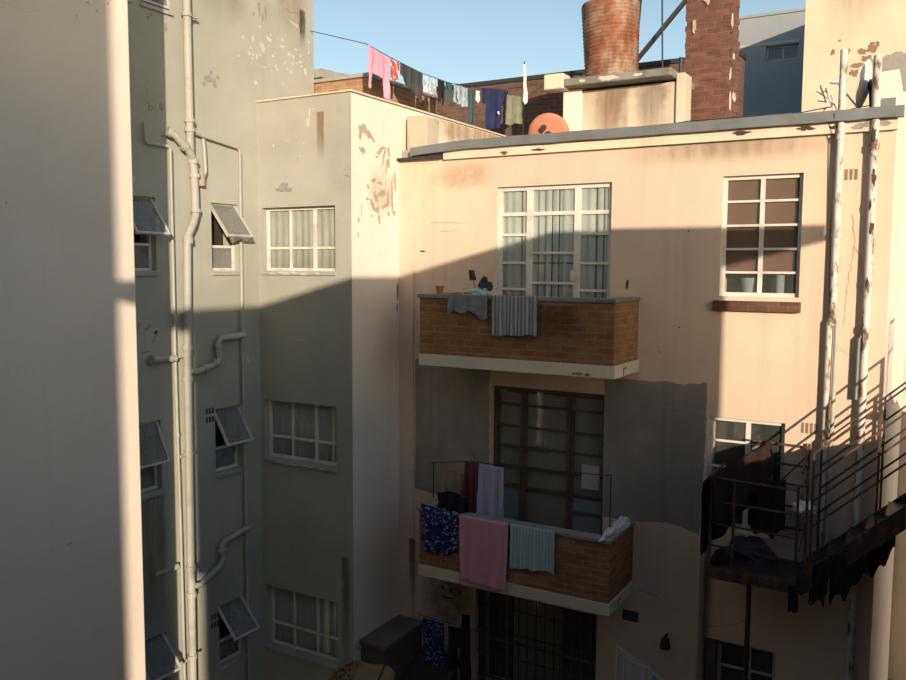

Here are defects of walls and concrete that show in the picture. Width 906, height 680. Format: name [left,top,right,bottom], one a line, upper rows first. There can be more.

crack [129,52,163,116]
peeling [238,1,310,85]
spalling [831,40,880,77]
peeling [358,123,396,238]